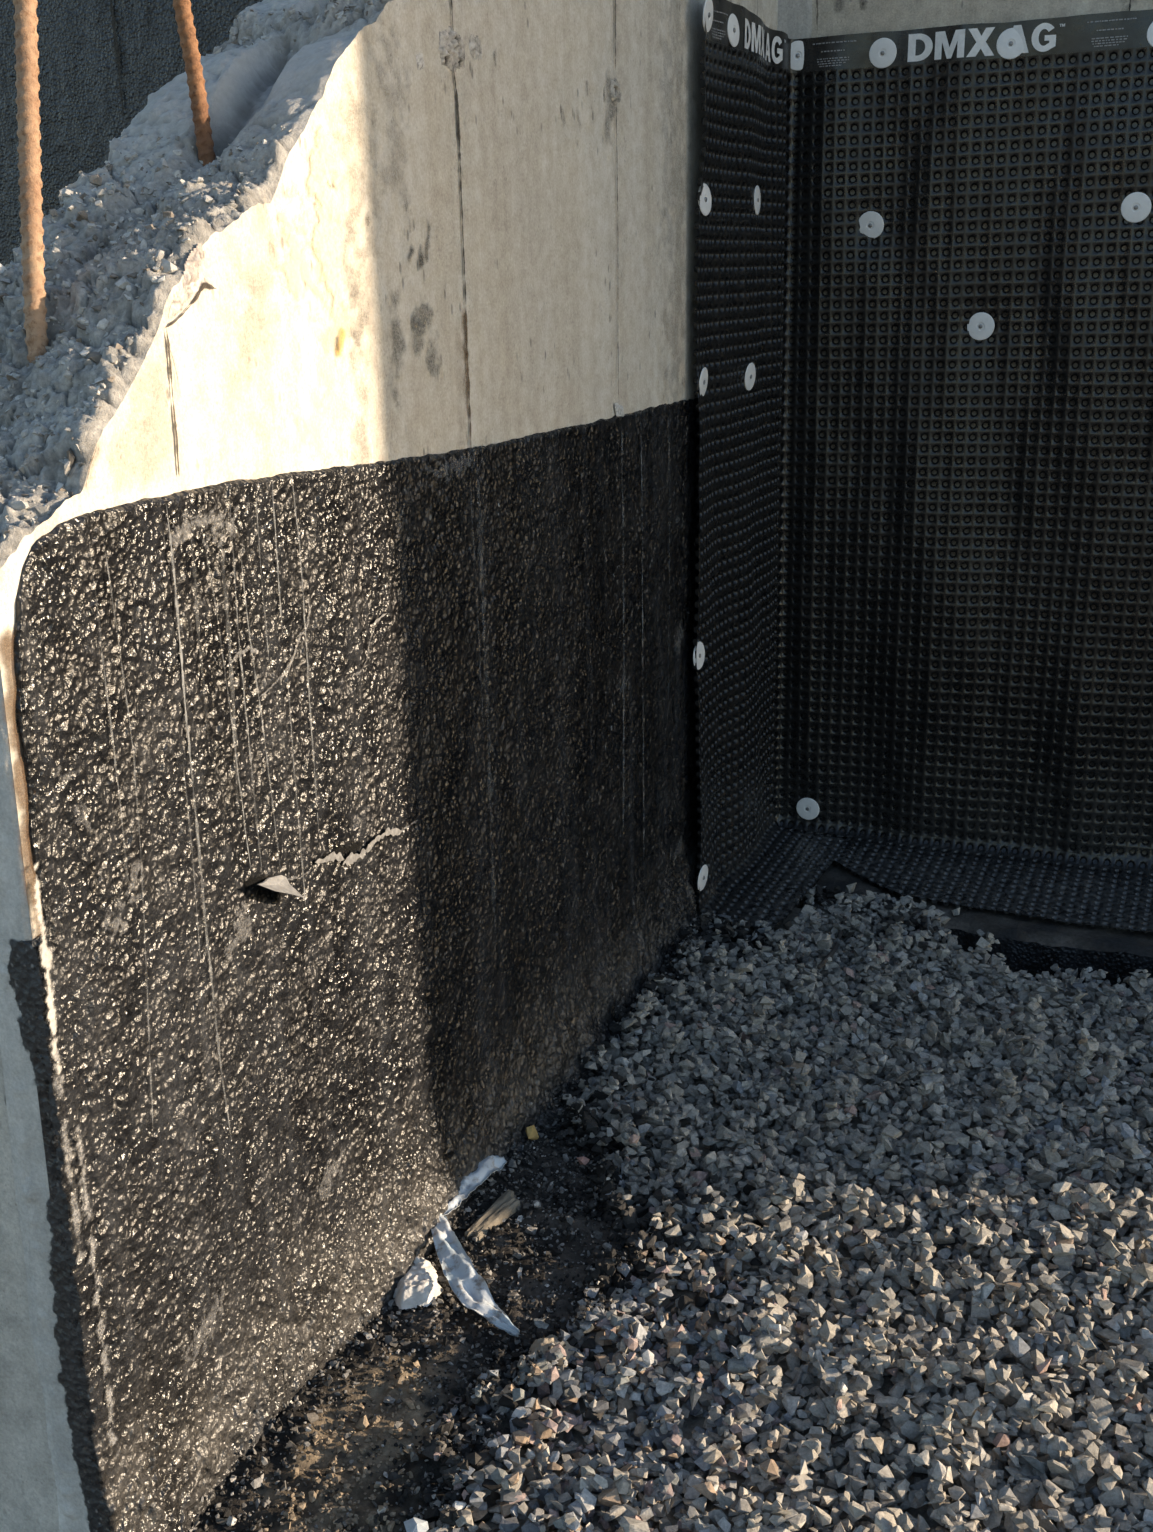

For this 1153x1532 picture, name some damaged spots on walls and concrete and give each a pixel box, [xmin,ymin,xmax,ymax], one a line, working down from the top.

spalling [173,0,216,167]
spalling [416,26,496,74]
spalling [13,0,61,363]
spalling [168,243,214,318]
peeling [165,510,237,546]
crack [291,820,418,880]